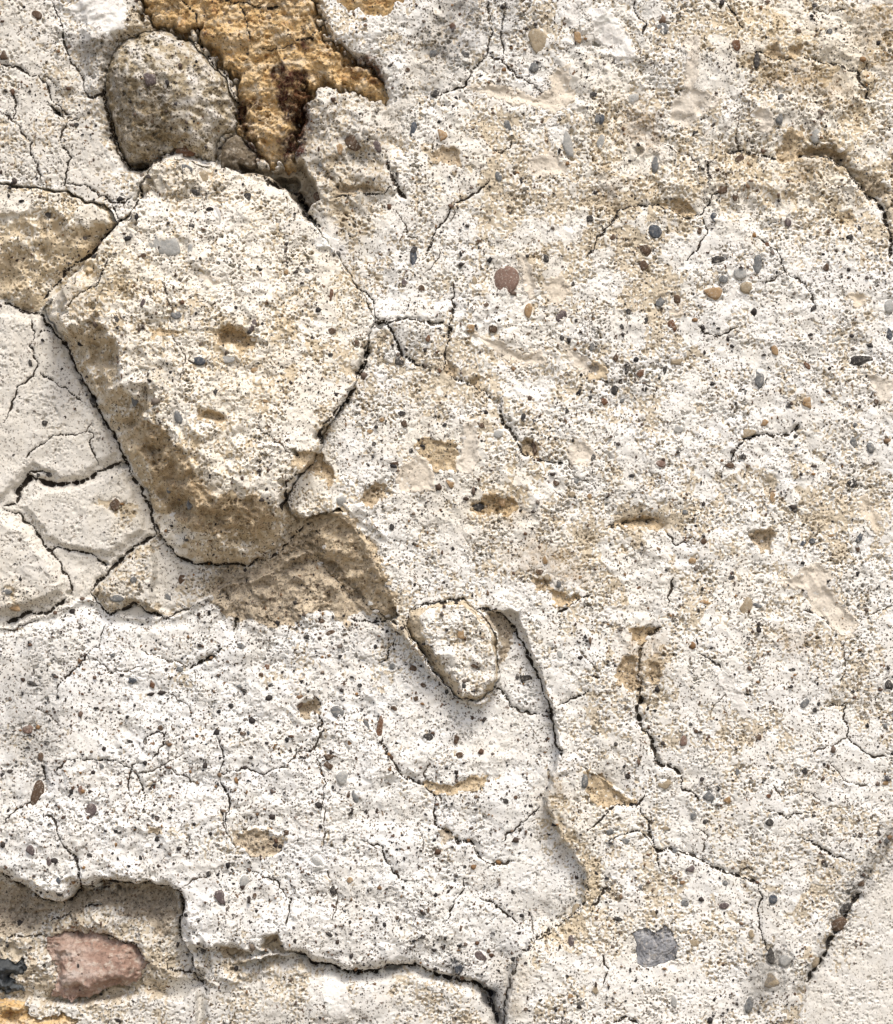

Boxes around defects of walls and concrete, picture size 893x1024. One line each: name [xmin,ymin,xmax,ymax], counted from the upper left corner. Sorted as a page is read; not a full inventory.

spalling [335,182,385,197]
crack [587,112,893,261]
crack [1,0,604,760]
crack [635,575,700,801]
crack [804,610,886,787]
spalling [0,878,185,937]
crack [3,695,339,995]
spalling [219,946,245,959]
peeling [321,971,356,1023]
crack [293,877,608,1024]
crack [380,736,539,866]
crack [586,789,768,952]